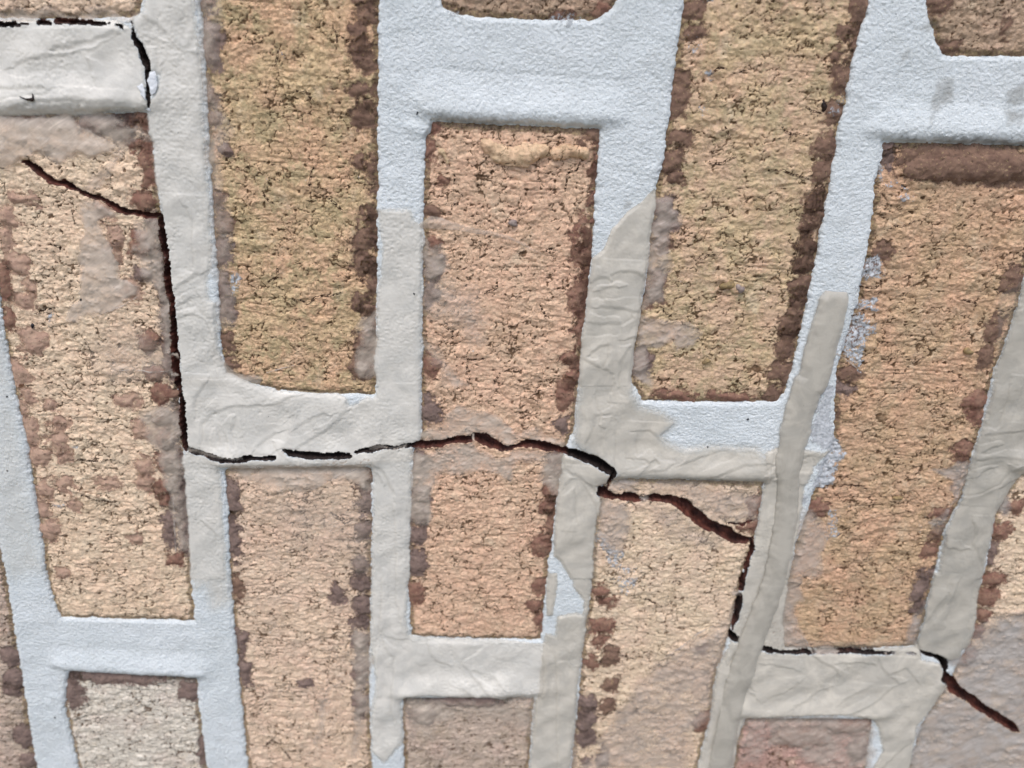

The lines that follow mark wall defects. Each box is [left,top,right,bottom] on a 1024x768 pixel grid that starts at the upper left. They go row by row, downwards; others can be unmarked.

crack [0,17,151,108]
crack [709,63,763,87]
crack [781,106,821,140]
crack [709,126,736,165]
crack [22,159,1019,732]